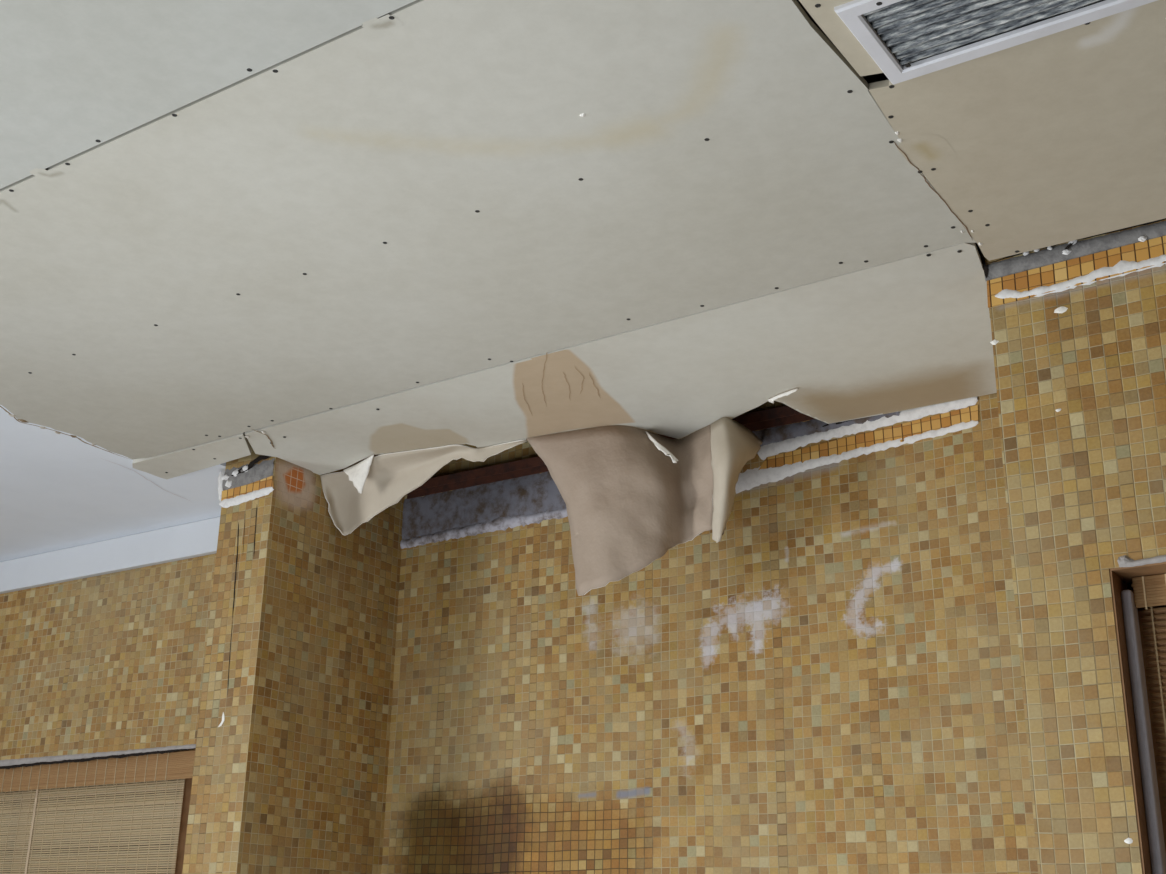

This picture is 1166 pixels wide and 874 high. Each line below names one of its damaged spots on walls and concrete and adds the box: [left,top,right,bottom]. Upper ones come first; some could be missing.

spalling [0,406,123,457]
peeling [361,421,476,455]
peeling [505,348,643,439]
leakage [836,515,901,542]
leakage [574,578,678,680]
leakage [693,544,802,678]
leakage [836,553,908,649]
leakage [381,706,708,874]